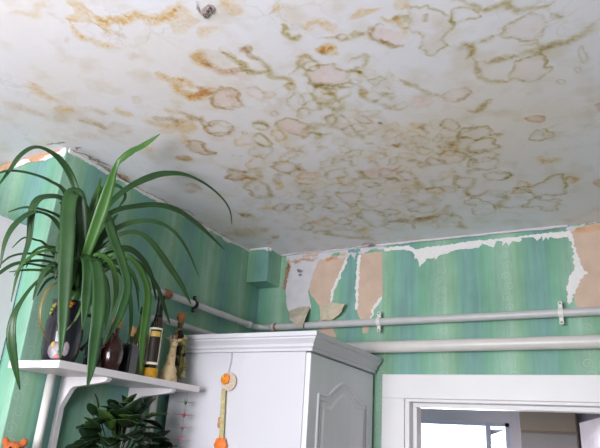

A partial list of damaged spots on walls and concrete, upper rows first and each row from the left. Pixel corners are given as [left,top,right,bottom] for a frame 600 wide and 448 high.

flaking render [0,149,61,171]
flaking render [302,253,348,306]
flaking render [357,251,383,333]
flaking render [571,223,600,308]